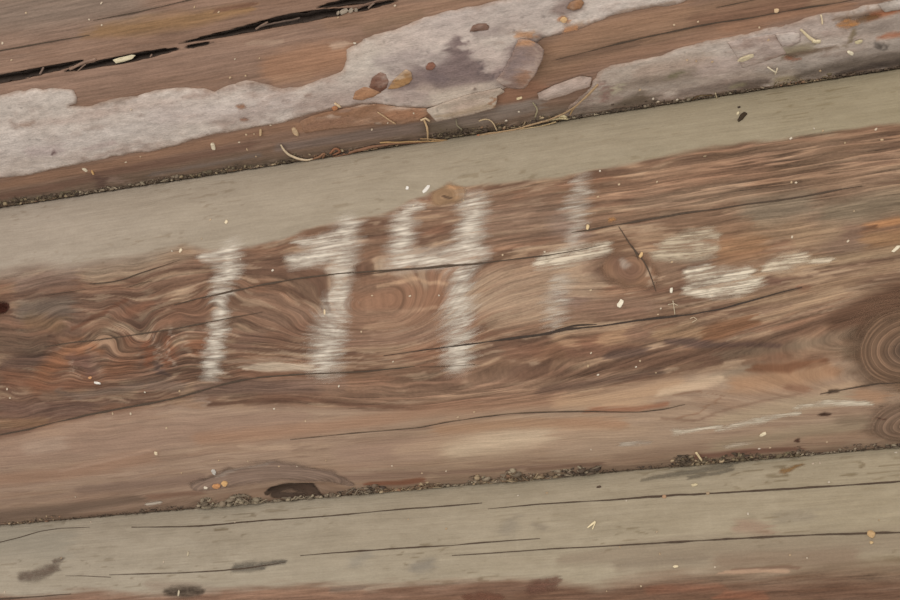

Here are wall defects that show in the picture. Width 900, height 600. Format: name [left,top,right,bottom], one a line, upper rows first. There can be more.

crack [0,0,396,83]
peeling [470,23,489,32]
peeling [496,39,544,89]
peeling [567,0,584,11]
peeling [300,70,429,133]
crack [174,186,860,305]
crack [0,287,802,440]
crack [131,481,900,528]
crack [1,527,86,542]
crack [92,531,900,577]